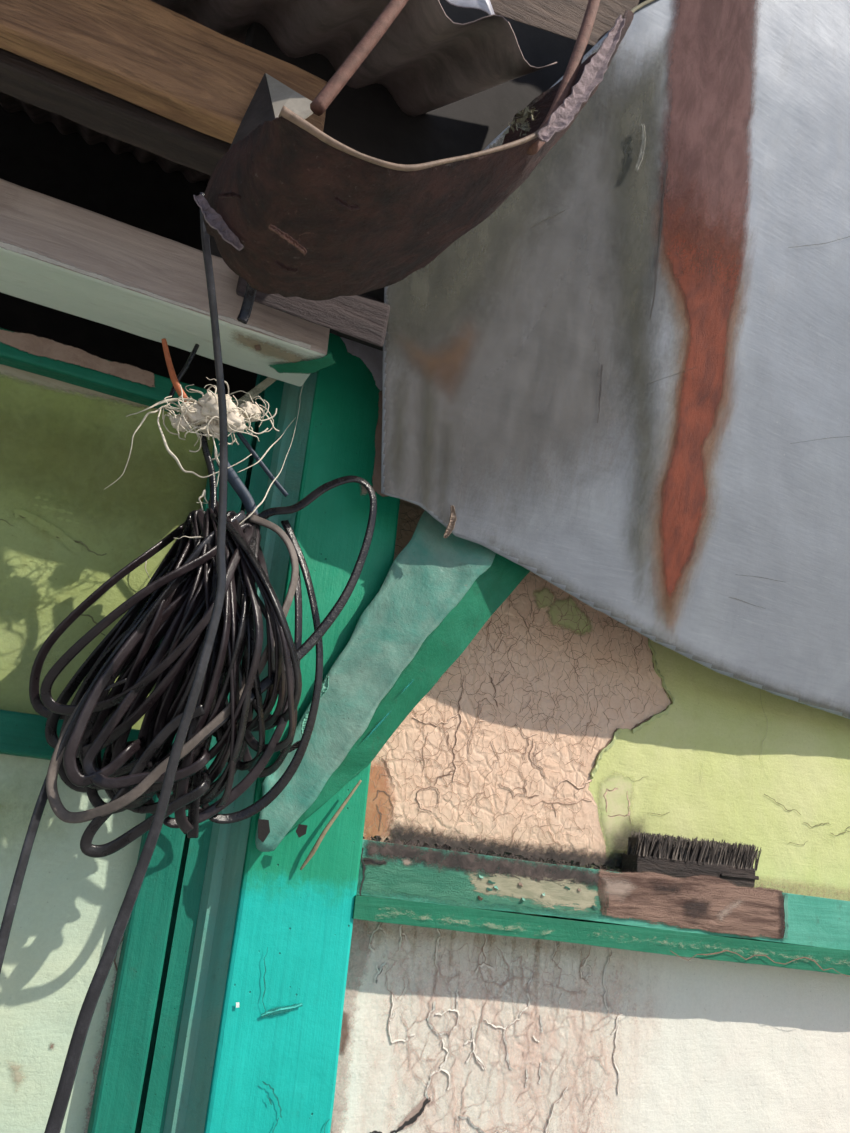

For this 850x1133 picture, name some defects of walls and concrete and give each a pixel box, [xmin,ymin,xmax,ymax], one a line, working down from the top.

corrosion [269,224,307,256]
peeling [340,337,425,560]
corrosion [654,0,758,617]
crack [359,574,670,896]
peeling [331,571,848,1133]
crack [369,922,623,1133]